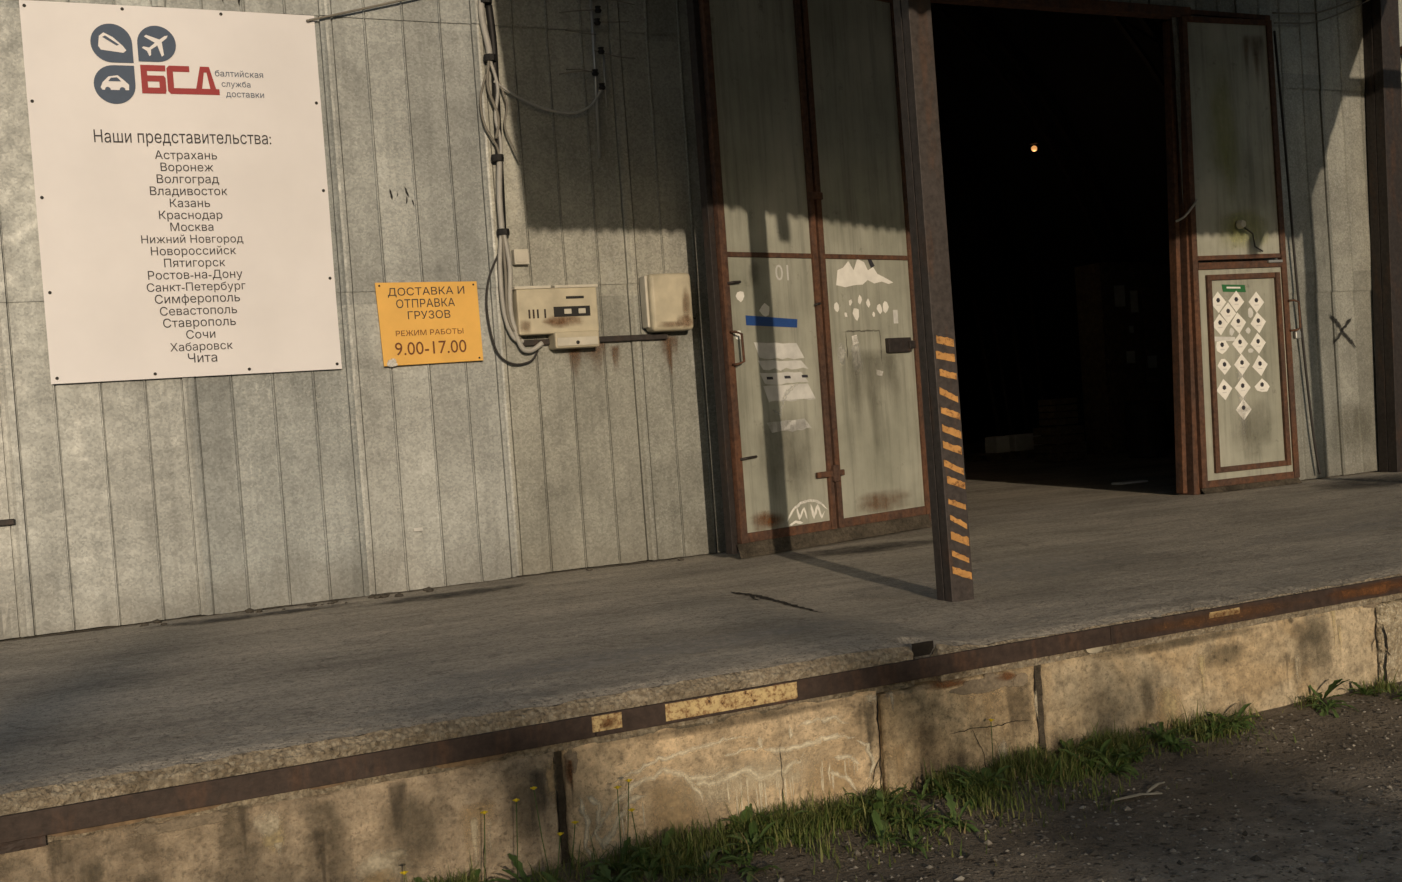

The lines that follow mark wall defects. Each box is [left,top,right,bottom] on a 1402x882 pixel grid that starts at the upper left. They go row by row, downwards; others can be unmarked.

crack [1372,608,1392,685]